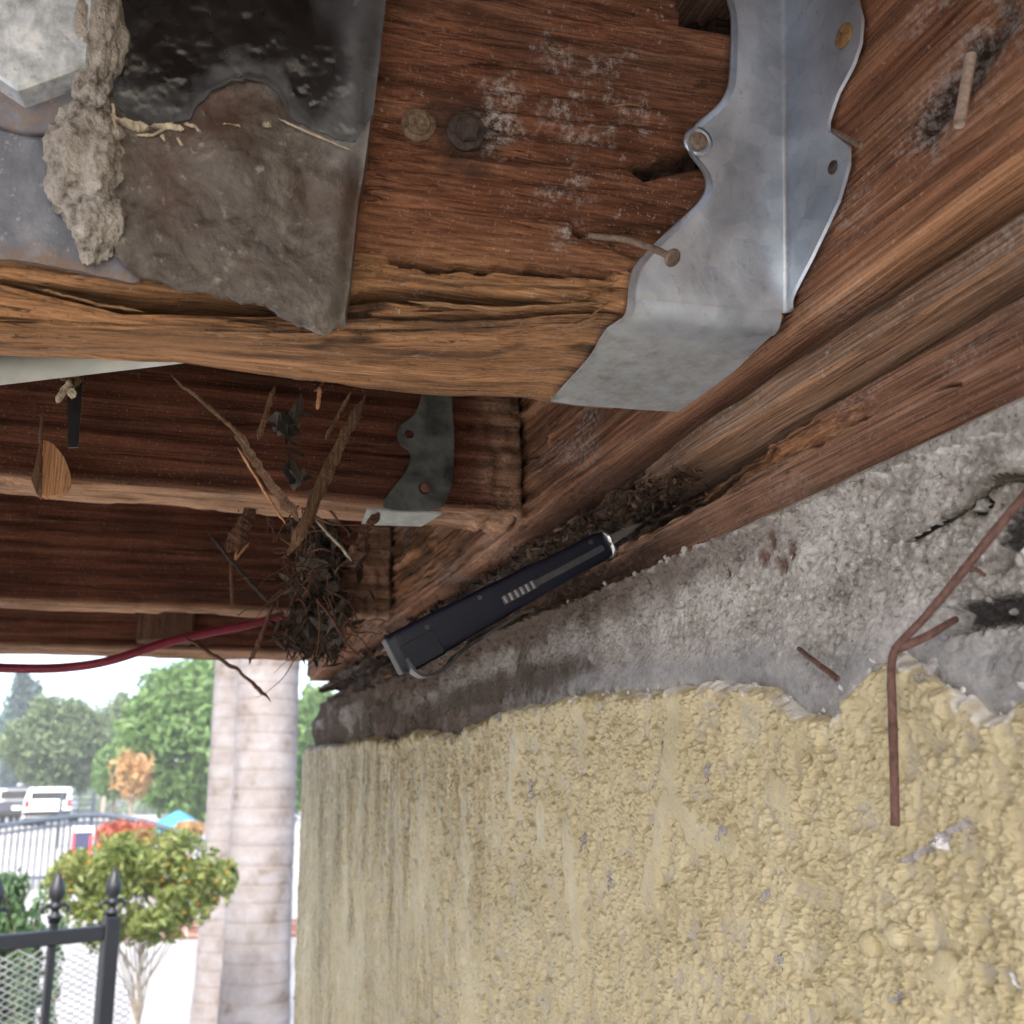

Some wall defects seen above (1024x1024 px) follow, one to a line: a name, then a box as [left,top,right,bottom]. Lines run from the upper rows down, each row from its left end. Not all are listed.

spalling [632,544,696,576]
spalling [997,511,1024,567]
spalling [964,572,1024,634]
peeling [914,657,940,682]